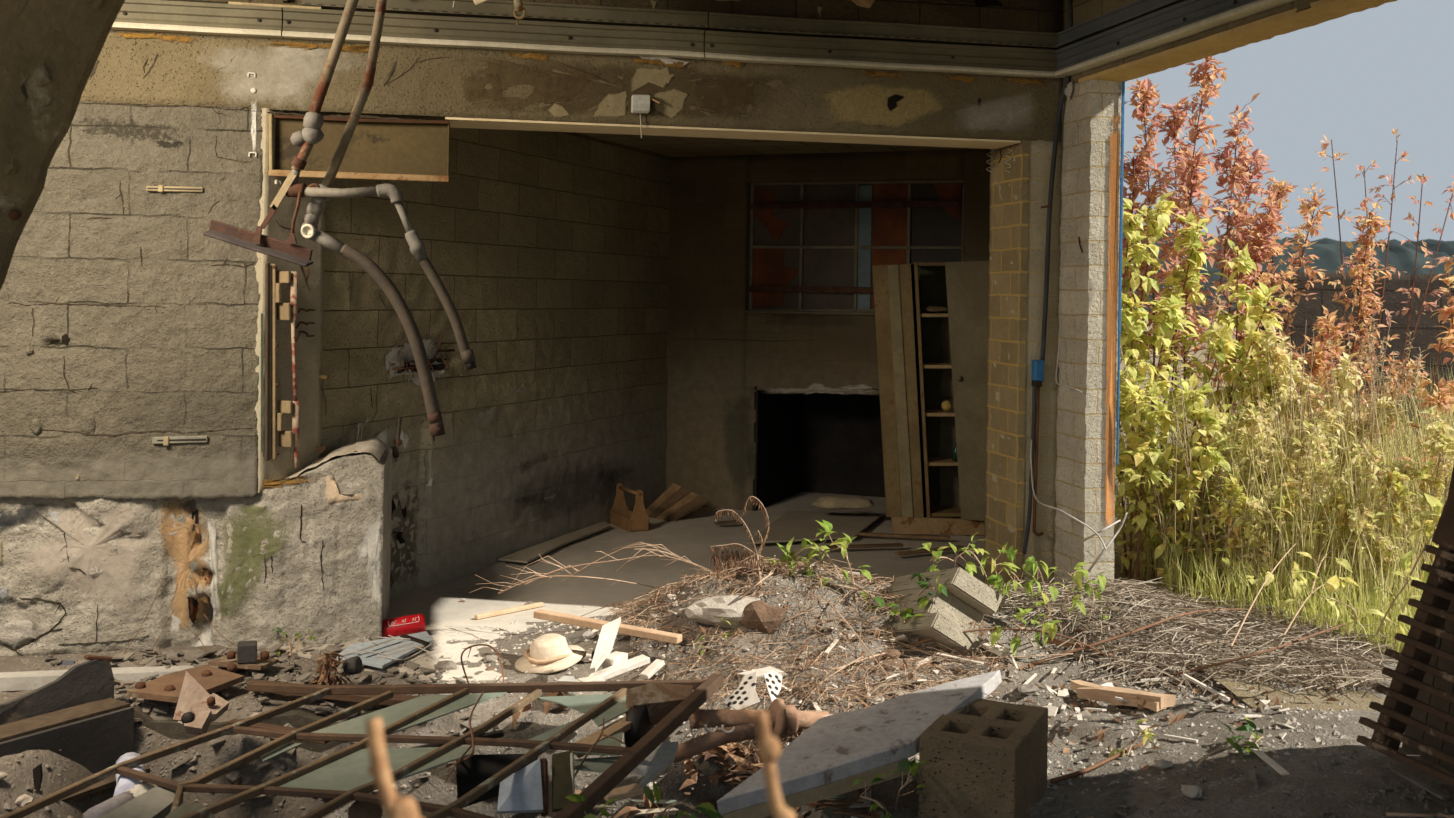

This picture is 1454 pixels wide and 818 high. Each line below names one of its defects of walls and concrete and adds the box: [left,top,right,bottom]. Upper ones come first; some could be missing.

peeling [548,104,569,117]
peeling [593,56,689,118]
spalling [855,71,904,111]
crack [86,181,124,220]
crack [211,257,255,268]
crack [11,297,166,336]
crack [3,358,96,394]
crack [30,427,252,436]
crack [0,532,149,656]
spalling [187,596,203,623]